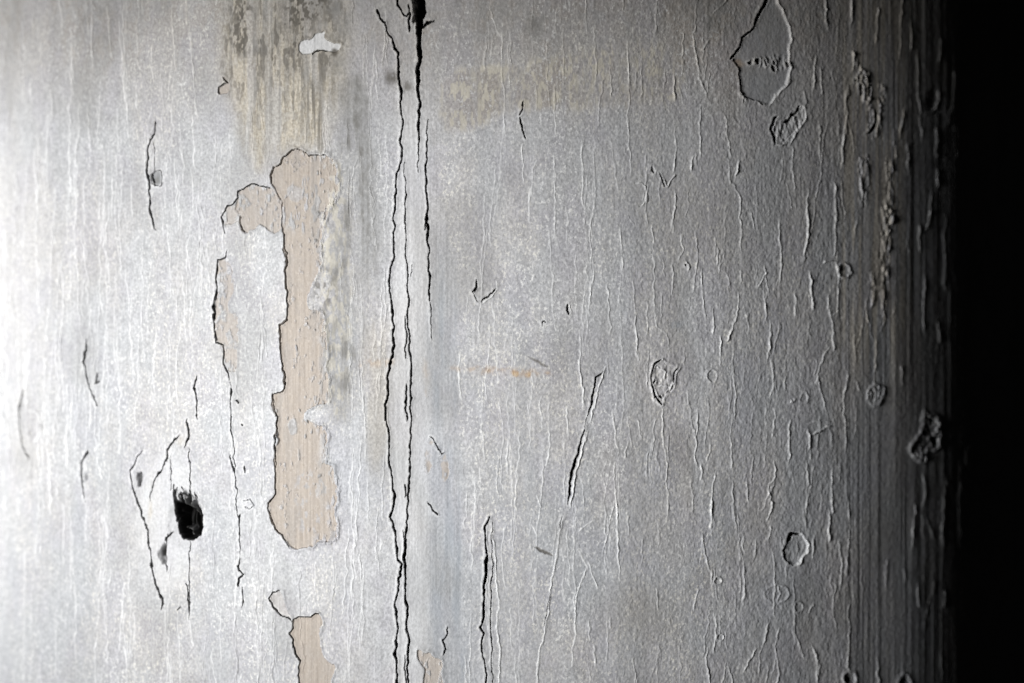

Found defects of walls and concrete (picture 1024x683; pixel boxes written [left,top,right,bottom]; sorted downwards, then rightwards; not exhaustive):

peeling [217,74,231,96]
peeling [296,29,343,56]
spalling [729,0,808,146]
crack [145,118,157,231]
peeling [211,256,240,374]
peeling [220,146,340,551]
crack [375,0,439,683]
spalling [910,410,944,463]
peeling [268,589,338,683]
crack [479,515,495,683]
crack [534,365,607,683]
peeling [782,530,811,567]